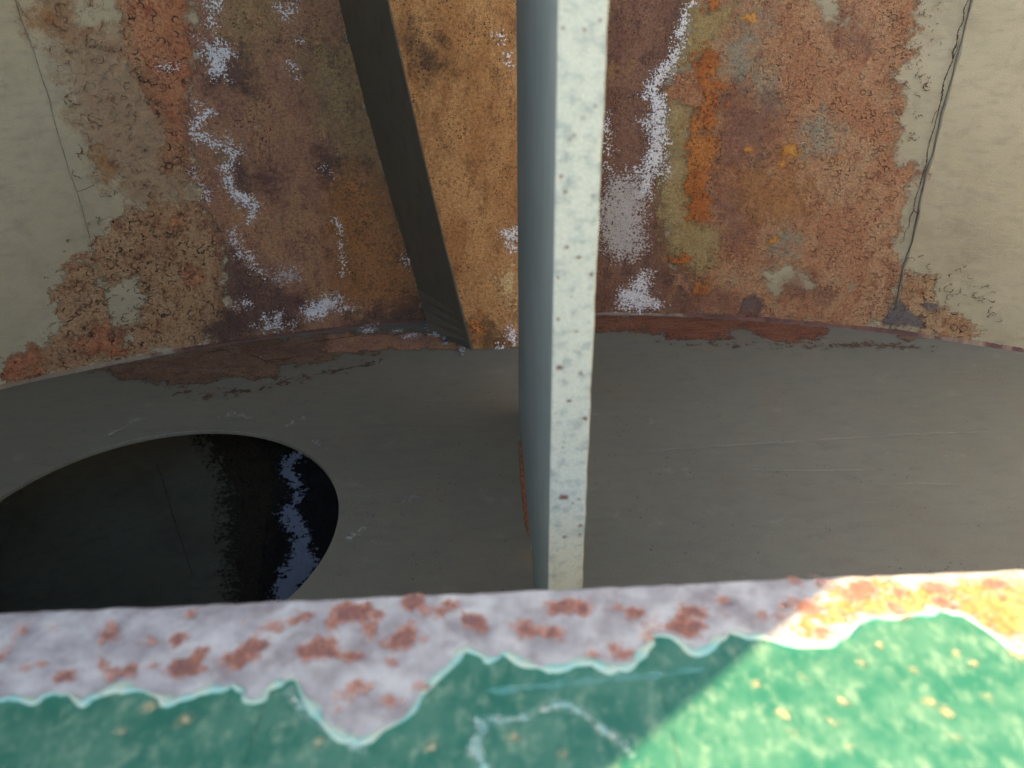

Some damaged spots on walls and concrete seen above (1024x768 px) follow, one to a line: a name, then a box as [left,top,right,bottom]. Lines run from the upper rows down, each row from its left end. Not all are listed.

crack [15,0,119,344]
damp [190,0,239,84]
damp [183,94,304,286]
rust [0,0,519,401]
damp [598,0,698,315]
rust [590,0,982,352]
crack [903,0,968,241]
damp [230,291,362,334]
peeling [883,300,937,329]
rust [97,593,488,682]
rust [509,597,592,641]
rust [612,603,709,642]